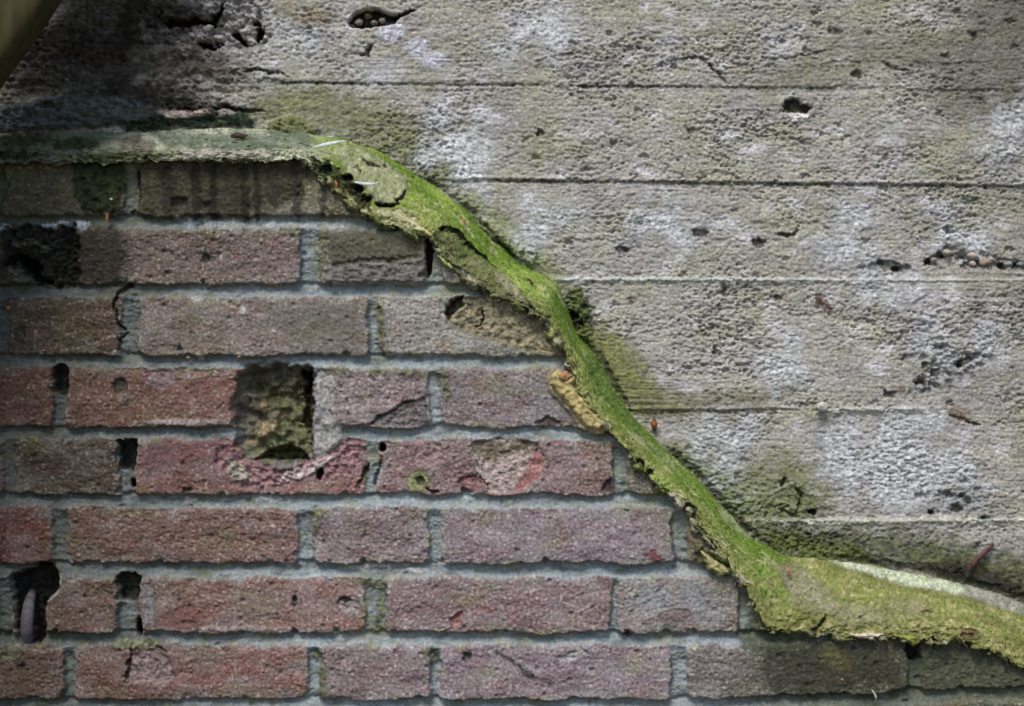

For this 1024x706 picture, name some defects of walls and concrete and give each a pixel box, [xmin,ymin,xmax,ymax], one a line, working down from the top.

water stain [4,0,233,120]
spalling [177,147,273,159]
water stain [415,103,491,192]
spalling [2,224,81,289]
crack [113,283,134,349]
spalling [324,145,604,433]
water stain [817,198,937,310]
spalling [215,438,366,492]
spalling [460,438,546,493]
water stain [820,406,975,508]
peeling [627,452,752,588]
water stain [933,559,1024,599]